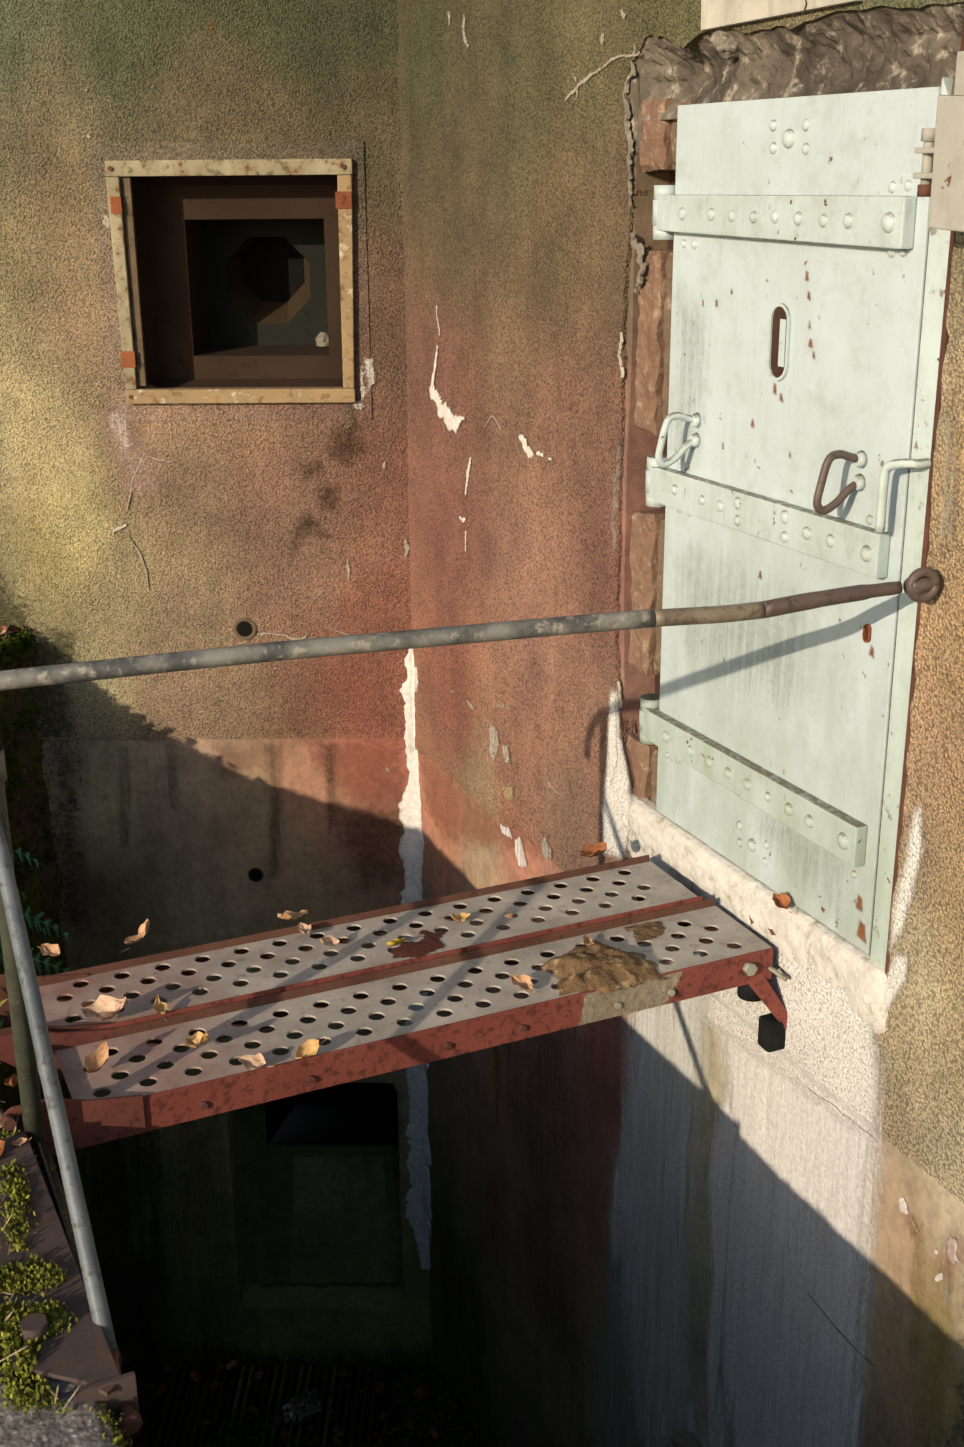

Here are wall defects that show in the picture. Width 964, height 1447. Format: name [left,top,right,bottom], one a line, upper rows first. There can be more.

crack [565,44,640,100]
spalling [622,0,964,207]
flaking render [629,232,646,293]
damp [334,358,375,456]
peeling [519,435,551,460]
flaking render [611,439,621,551]